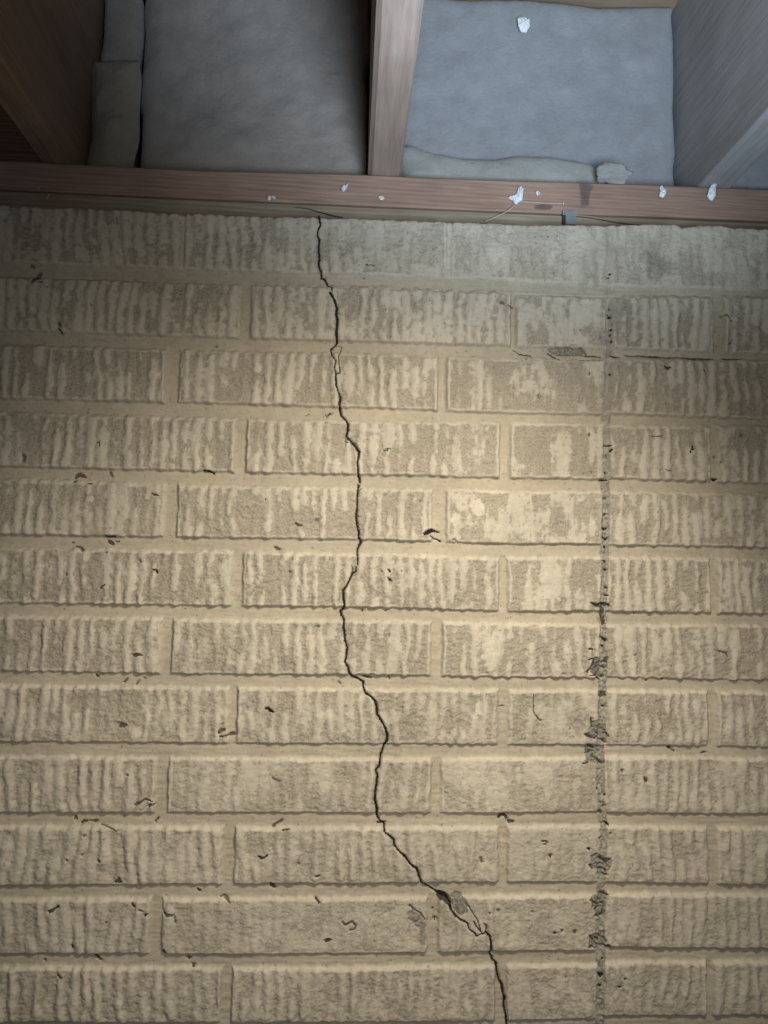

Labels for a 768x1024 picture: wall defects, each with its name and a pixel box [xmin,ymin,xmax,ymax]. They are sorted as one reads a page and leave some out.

crack [317,215,507,1024]